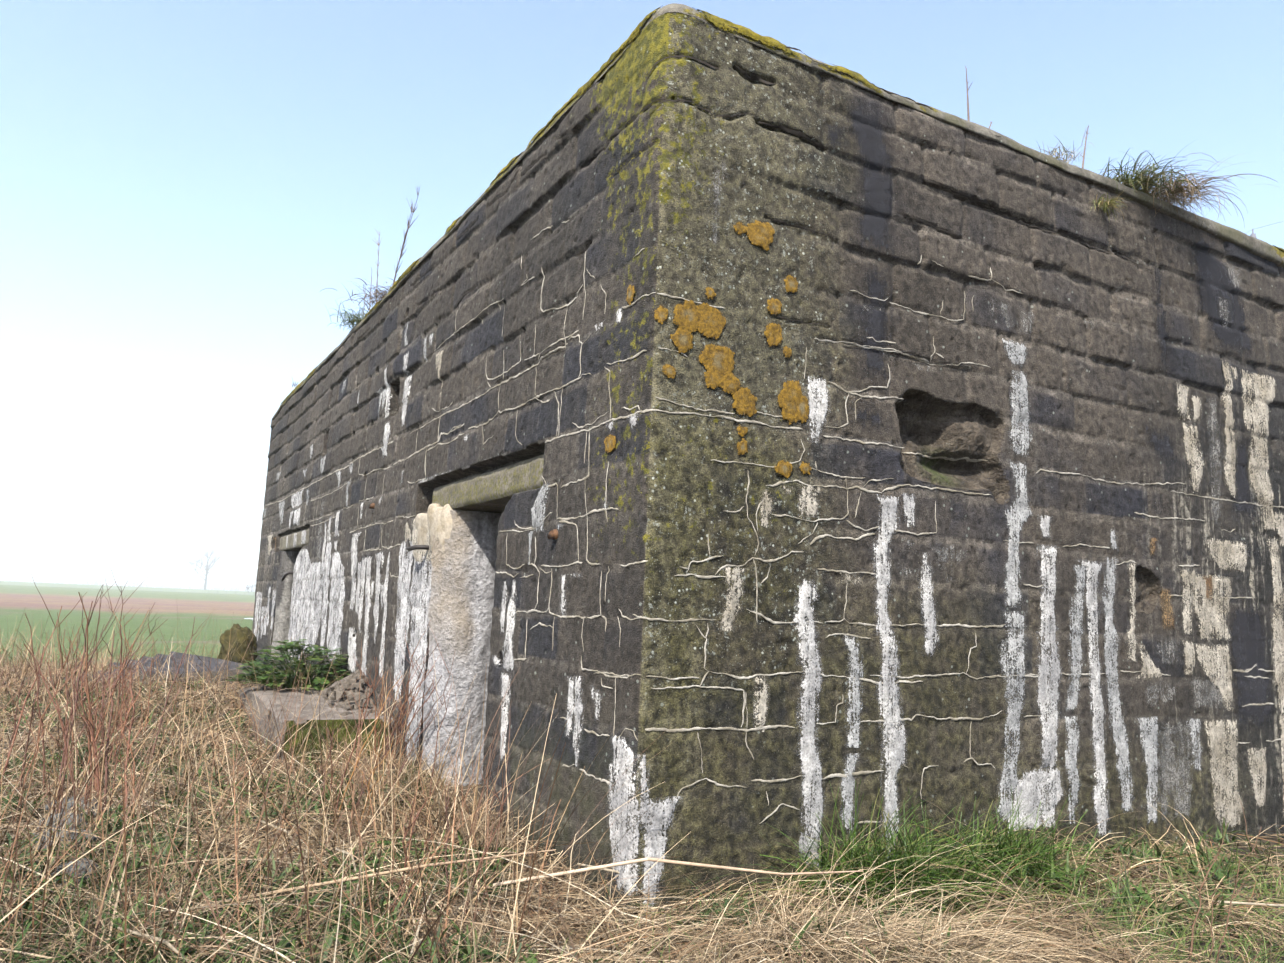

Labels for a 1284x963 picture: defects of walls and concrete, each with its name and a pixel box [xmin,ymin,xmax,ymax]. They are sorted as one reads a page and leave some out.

crack [785,46,934,110]
crack [921,177,1153,272]
leakage [254,445,433,761]
leakage [493,581,517,759]
crack [265,212,1170,824]
leakage [794,579,825,869]
leakage [840,493,967,858]
leakage [989,232,1284,835]
crack [1036,469,1284,532]
crack [1169,564,1255,599]
crack [1233,664,1275,707]
leakage [608,735,680,915]